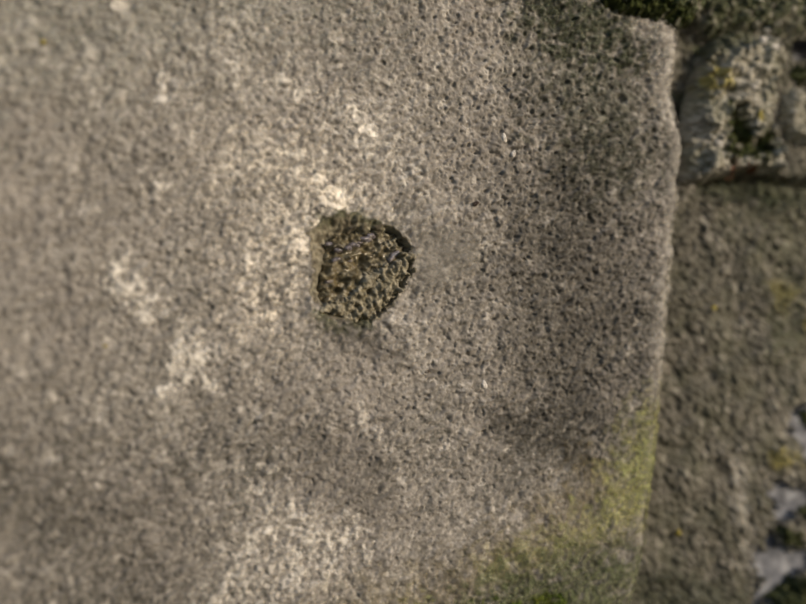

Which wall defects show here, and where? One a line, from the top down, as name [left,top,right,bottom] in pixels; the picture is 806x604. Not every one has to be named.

damp [524,0,669,74]
efflorescence [208,526,278,604]
efflorescence [284,551,306,591]
efflorescence [286,503,372,585]